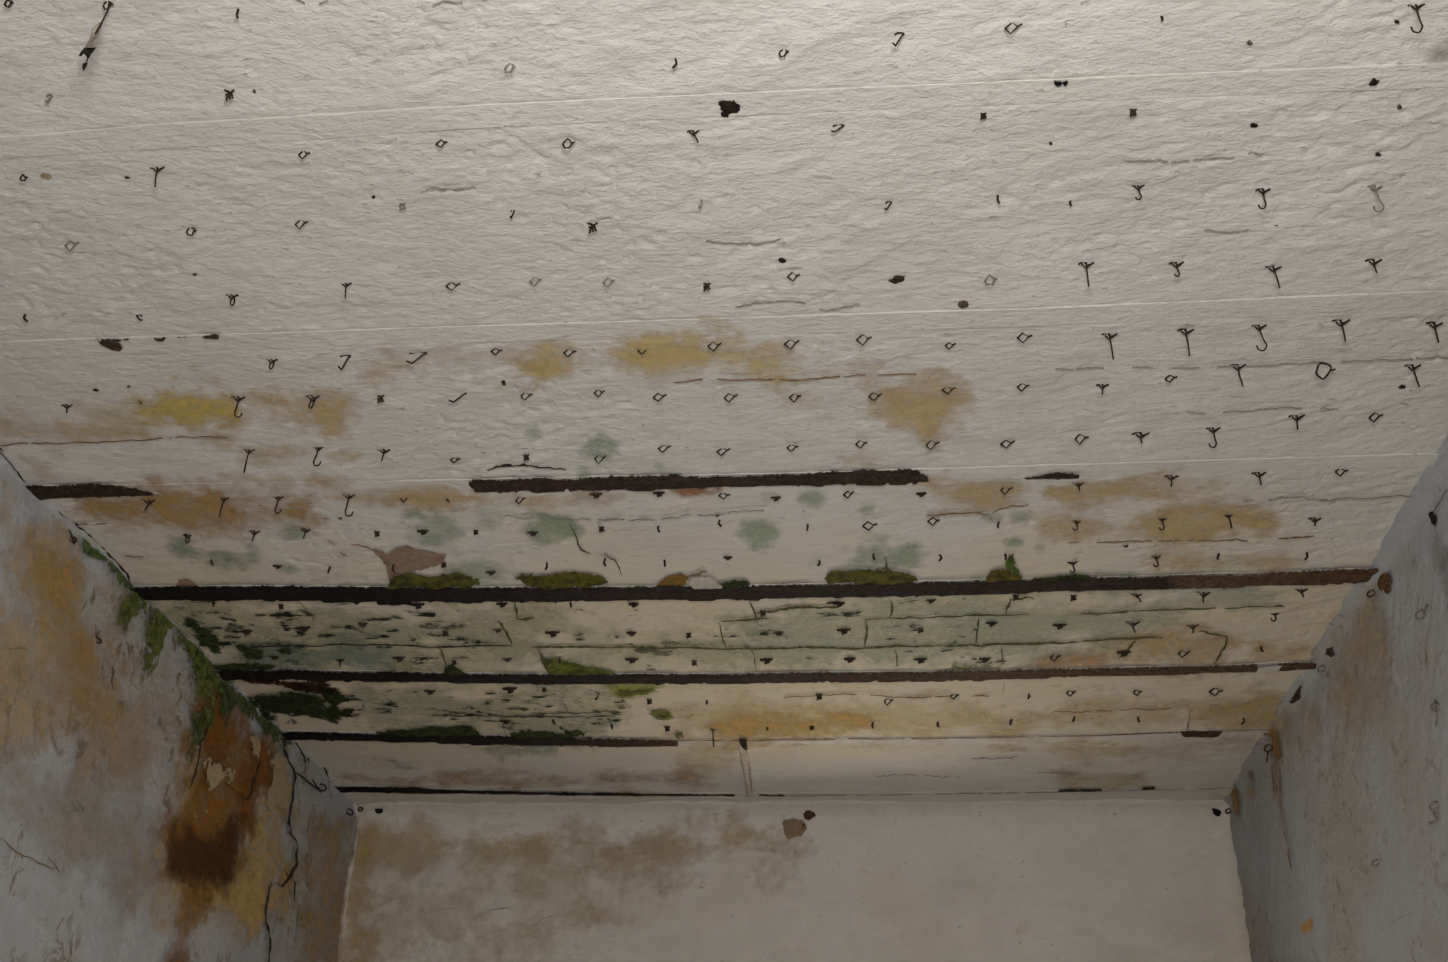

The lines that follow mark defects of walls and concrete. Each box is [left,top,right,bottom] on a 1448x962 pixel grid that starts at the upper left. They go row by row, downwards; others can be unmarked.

water stain [610,335,783,382]
water stain [137,392,240,425]
water stain [81,481,245,532]
water stain [1046,479,1275,542]
peeling [374,545,446,580]
water stain [815,601,864,617]
water stain [0,527,118,747]
mould [173,601,494,670]
water stain [614,622,788,670]
mould [299,684,626,733]
water stain [303,821,439,962]